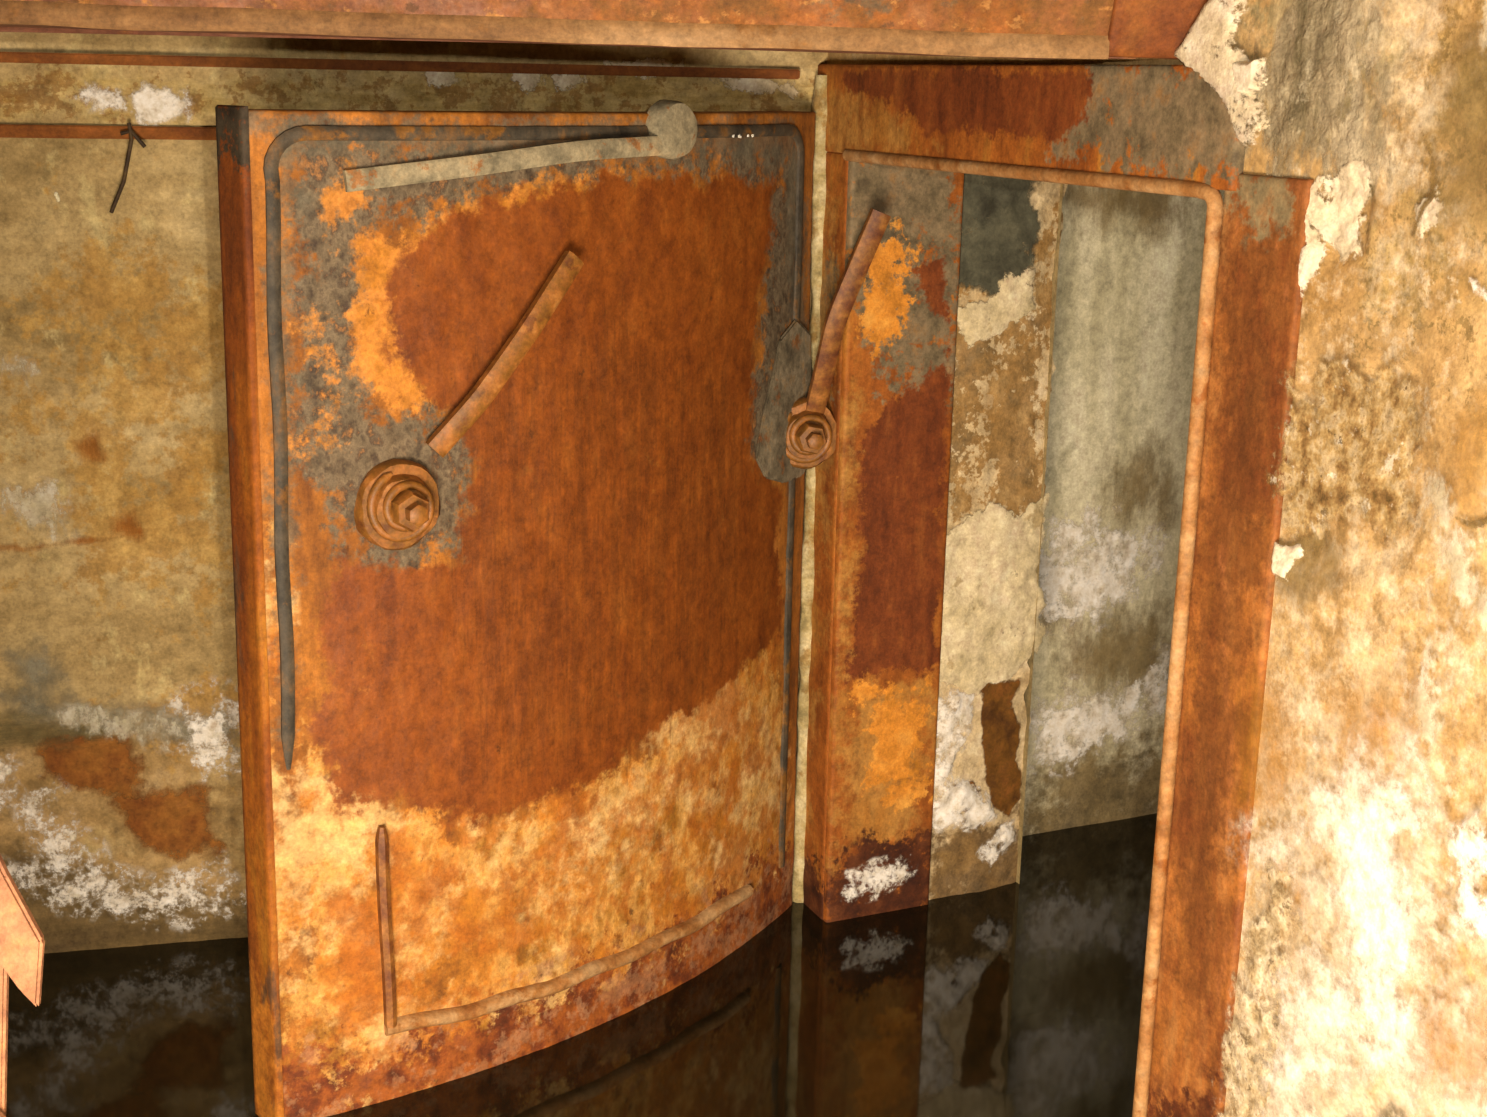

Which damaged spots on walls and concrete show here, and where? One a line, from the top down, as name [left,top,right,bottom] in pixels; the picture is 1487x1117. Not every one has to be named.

flaking render [957,268,1036,349]
flaking render [939,493,1050,696]
efflorescence [1428,477,1487,631]
leakage [0,656,241,780]
rust [954,680,1022,816]
leakage [0,762,238,928]
efflorescence [842,857,911,901]
efflorescence [1250,636,1487,1117]